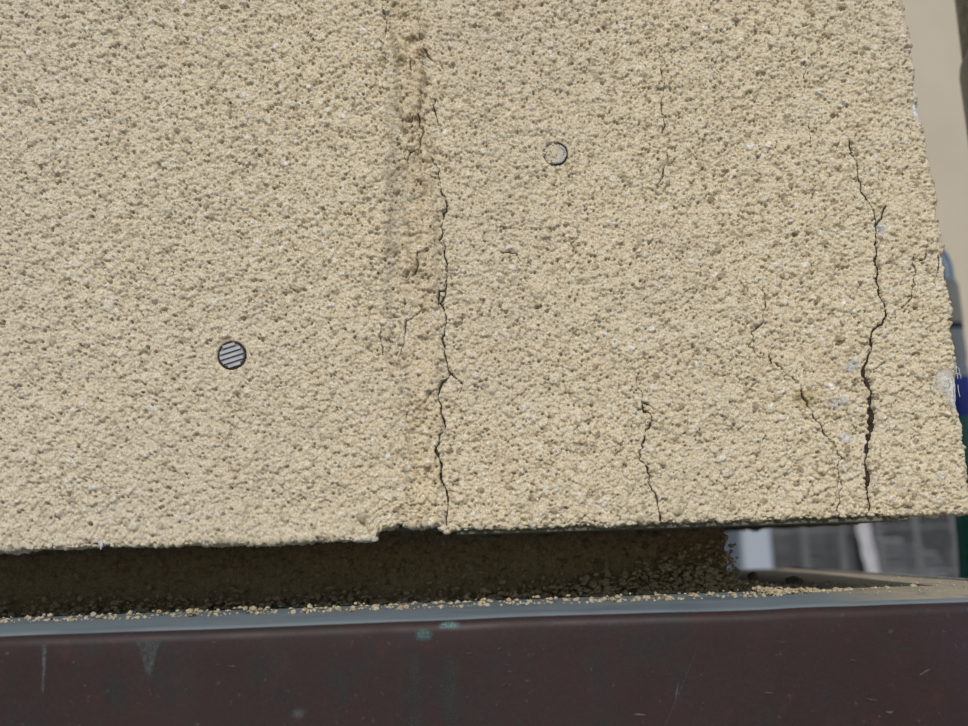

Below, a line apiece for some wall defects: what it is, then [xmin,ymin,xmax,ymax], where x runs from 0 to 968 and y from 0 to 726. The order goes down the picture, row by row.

crack [379,92,463,530]
crack [631,377,661,526]
crack [740,135,940,515]